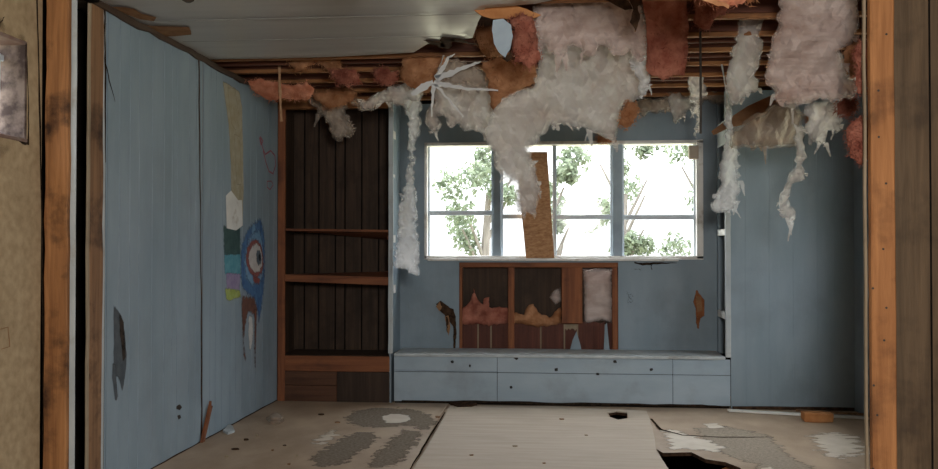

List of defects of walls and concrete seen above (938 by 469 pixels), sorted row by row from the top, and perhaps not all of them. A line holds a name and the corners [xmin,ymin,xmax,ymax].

spalling [694,426,815,469]